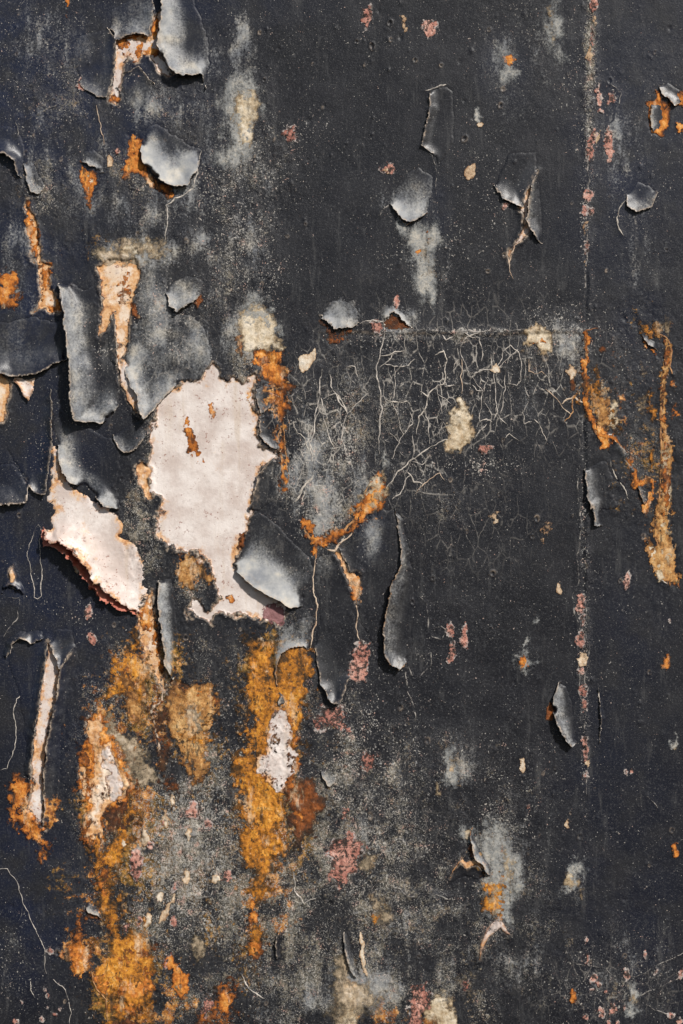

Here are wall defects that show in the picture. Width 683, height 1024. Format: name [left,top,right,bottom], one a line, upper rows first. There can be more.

peeling [71,0,210,110]
peeling [0,126,45,194]
peeling [107,124,202,240]
crack [293,323,569,502]
rust [562,321,682,588]
peeling [0,258,415,884]
rust [5,772,54,865]
rust [97,628,331,972]
efflorescence [436,746,461,795]
rust [59,775,190,1024]
water stain [324,953,385,1024]
water stain [404,981,457,1024]